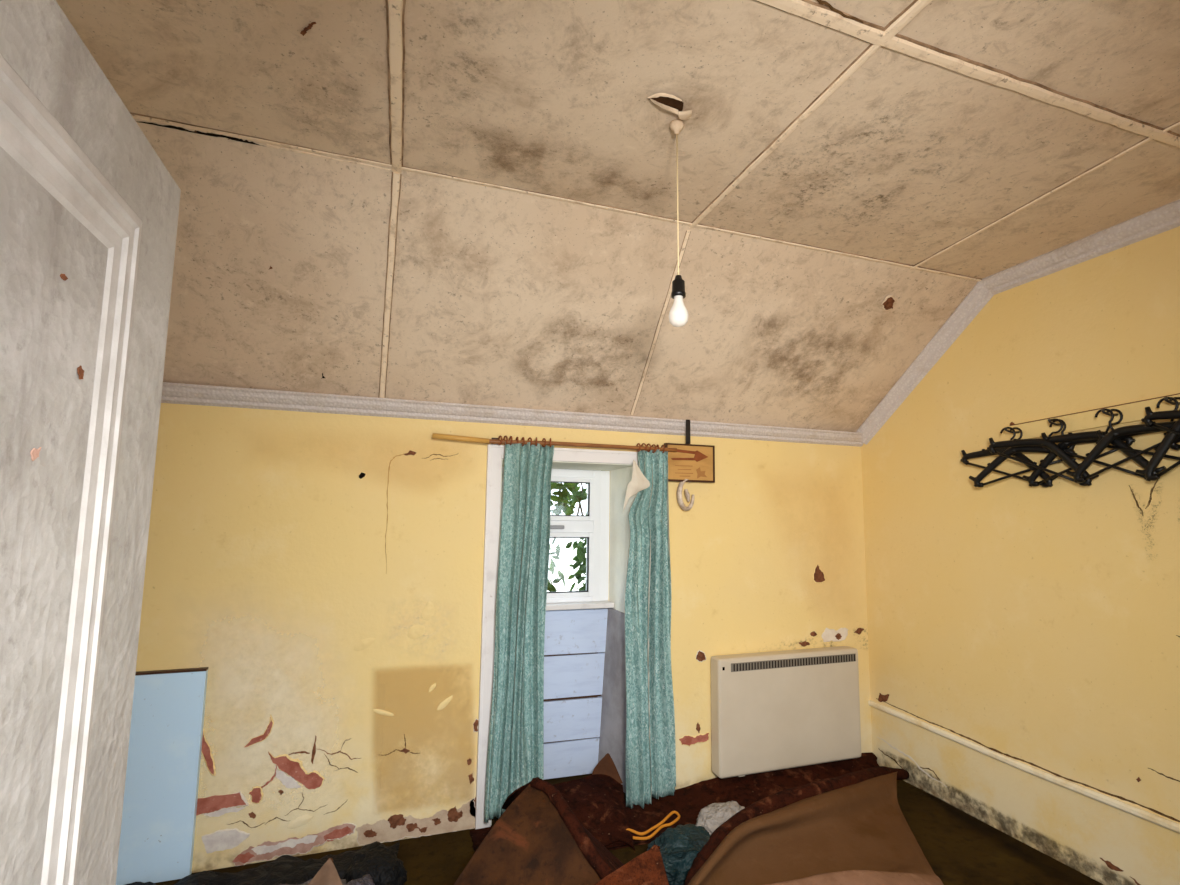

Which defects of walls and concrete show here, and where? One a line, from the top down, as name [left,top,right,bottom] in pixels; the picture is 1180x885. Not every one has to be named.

crack [817,0,863,23]
peeling [648,93,682,101]
crack [139,122,266,147]
crack [319,738,361,773]
flaking render [196,714,476,866]
crack [228,793,348,828]
water stain [891,757,1134,885]